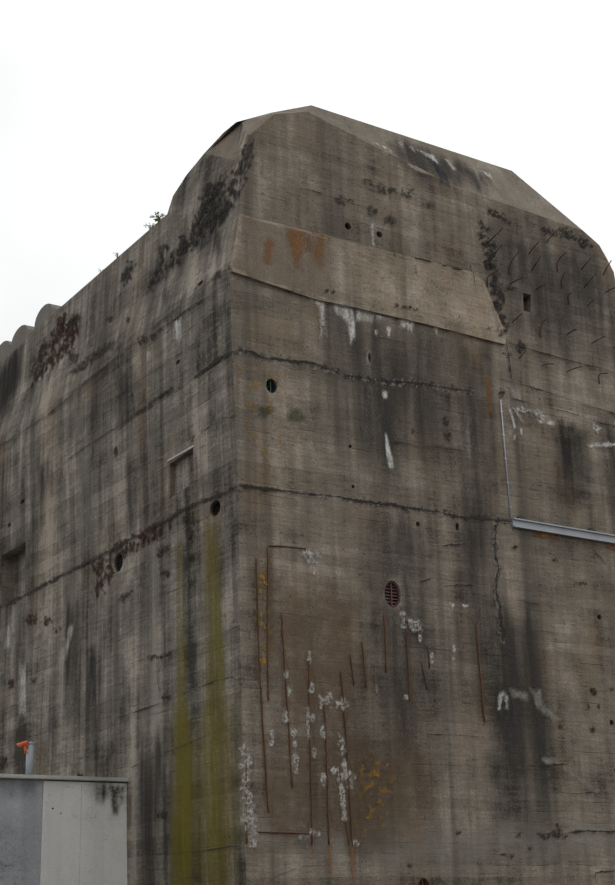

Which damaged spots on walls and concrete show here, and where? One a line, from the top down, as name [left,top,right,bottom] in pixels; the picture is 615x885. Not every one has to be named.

water stain [399,143,492,189]
crack [0,268,228,446]
crack [69,312,472,461]
water stain [238,218,435,469]
water stain [509,388,522,438]
crack [0,484,540,641]
rust [245,660,313,845]
rust [256,545,306,813]
rust [340,641,367,868]
water stain [497,611,558,776]
crack [569,827,615,835]